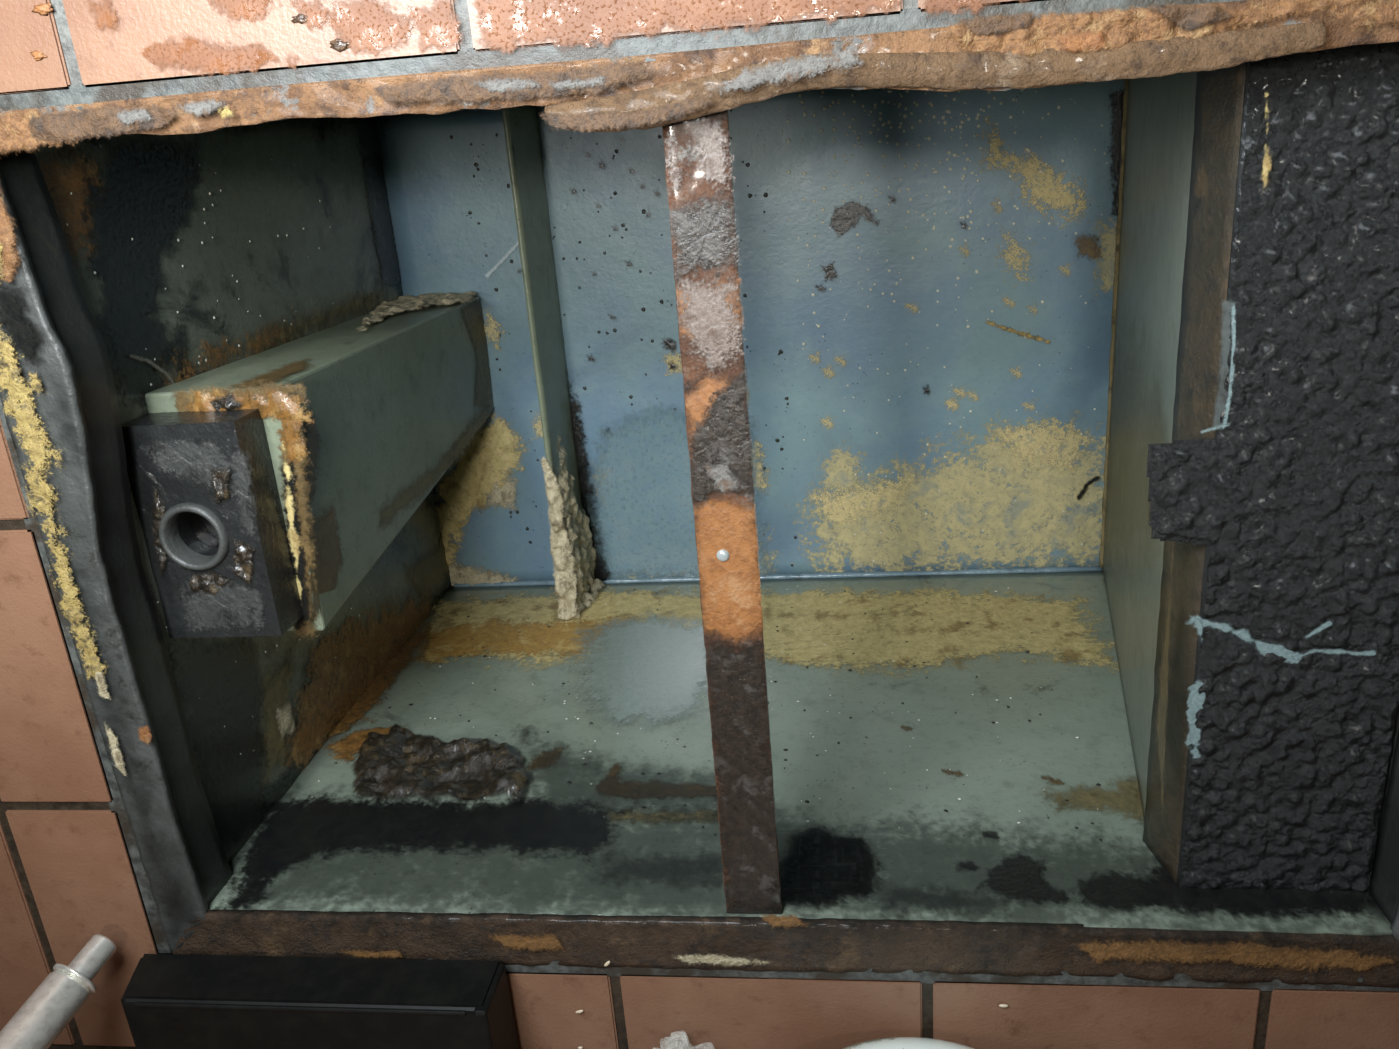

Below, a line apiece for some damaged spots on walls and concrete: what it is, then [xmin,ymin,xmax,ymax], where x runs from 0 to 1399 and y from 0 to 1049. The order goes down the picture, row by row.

corrosion [948,0,1399,57]
water stain [670,194,741,278]
peeling [27,372,42,393]
corrosion [676,272,745,434]
corrosion [694,458,763,641]
water stain [166,365,1119,914]
peeling [92,657,109,699]
water stain [1157,541,1174,814]
water stain [1042,775,1144,821]
water stain [958,854,1377,918]
corrosion [677,954,770,966]
corrosion [1079,939,1399,971]